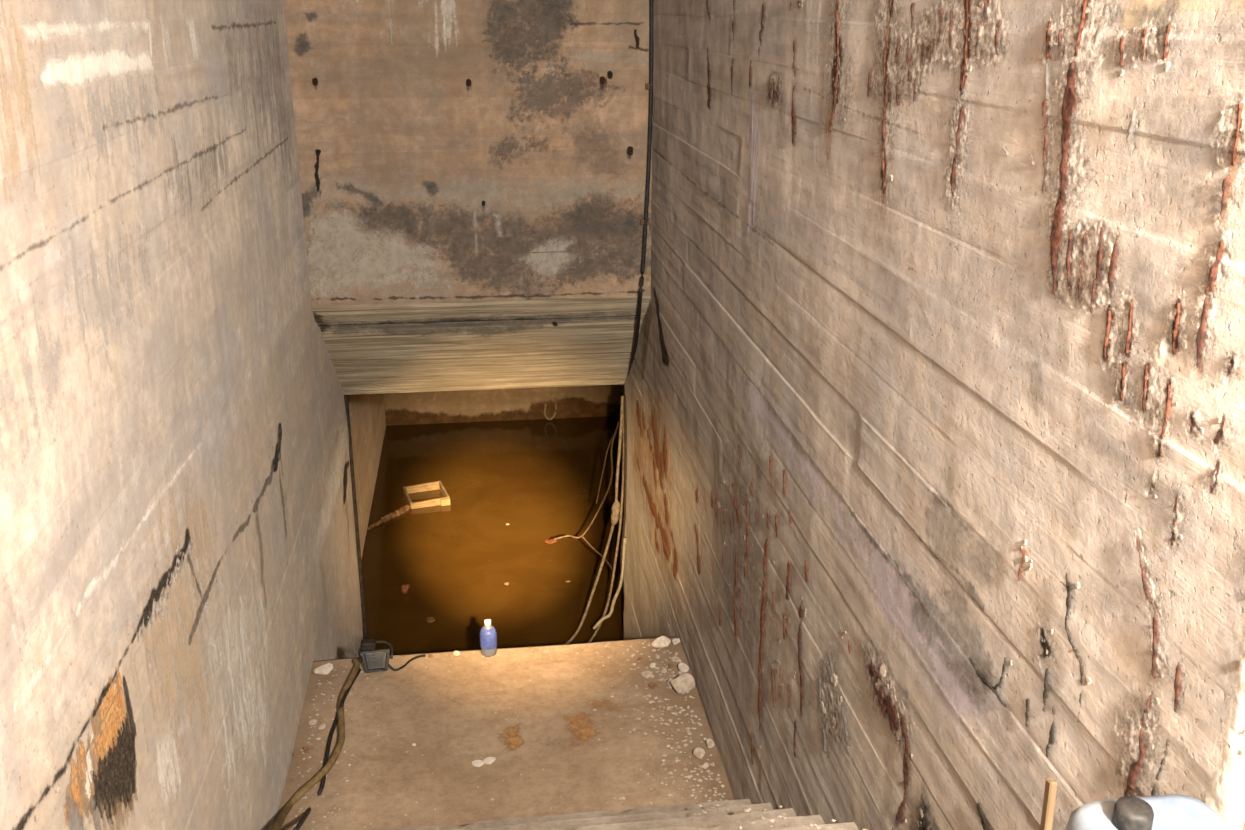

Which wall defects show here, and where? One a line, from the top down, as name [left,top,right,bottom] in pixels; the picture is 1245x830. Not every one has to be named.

leakage [487,0,582,69]
leakage [424,182,438,195]
leakage [302,185,651,301]
rust [636,401,678,578]
crack [1100,85,1245,798]
crack [13,423,287,830]
rust [751,577,768,764]
rust [785,575,807,757]
crack [969,573,1092,757]
spalling [1204,636,1245,818]